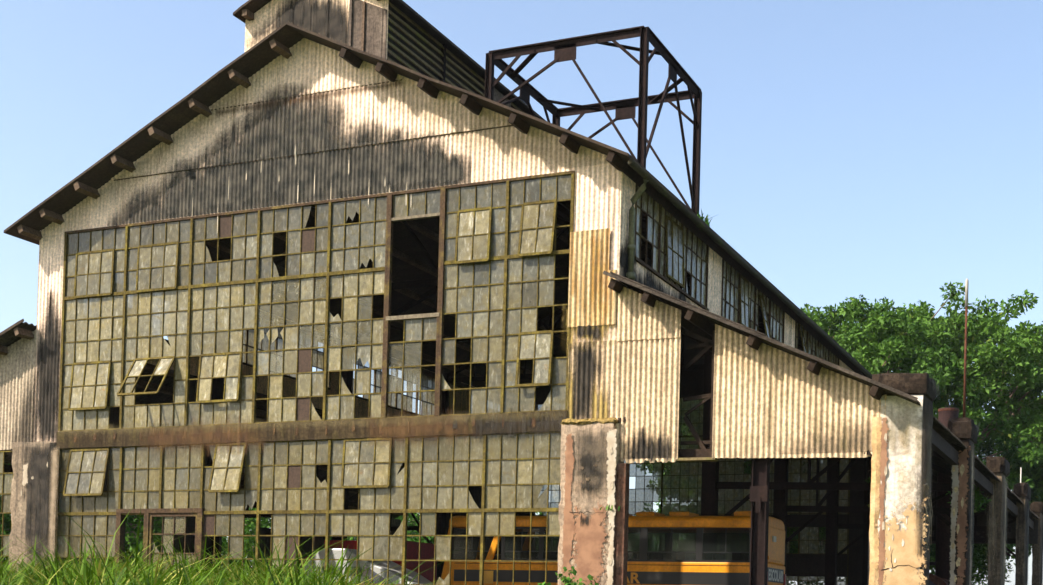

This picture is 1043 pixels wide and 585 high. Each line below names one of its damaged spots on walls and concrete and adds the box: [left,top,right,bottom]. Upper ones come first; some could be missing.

water stain [252,0,349,45]
water stain [112,85,471,230]
water stain [14,292,64,561]
water stain [474,325,608,495]
flaking render [875,417,929,585]
flaking render [949,446,970,585]